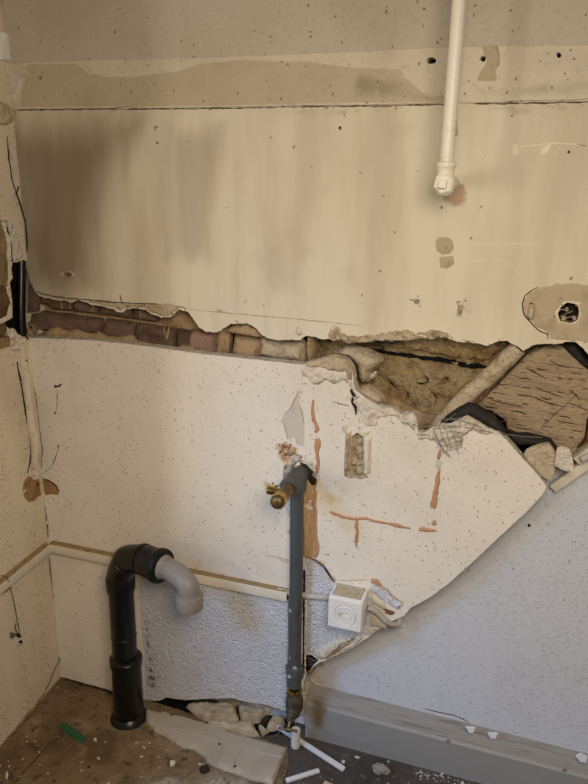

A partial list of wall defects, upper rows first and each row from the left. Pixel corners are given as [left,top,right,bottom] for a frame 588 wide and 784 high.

peeling [477,44,500,81]
spalling [0,215,10,319]
peeling [435,237,454,269]
peeling [522,283,588,342]
spalling [30,293,356,391]
spalling [328,323,453,346]
spalling [358,398,504,449]
spalling [283,451,320,486]
peeling [524,442,574,480]
peeling [23,476,59,502]
spalling [150,697,295,737]